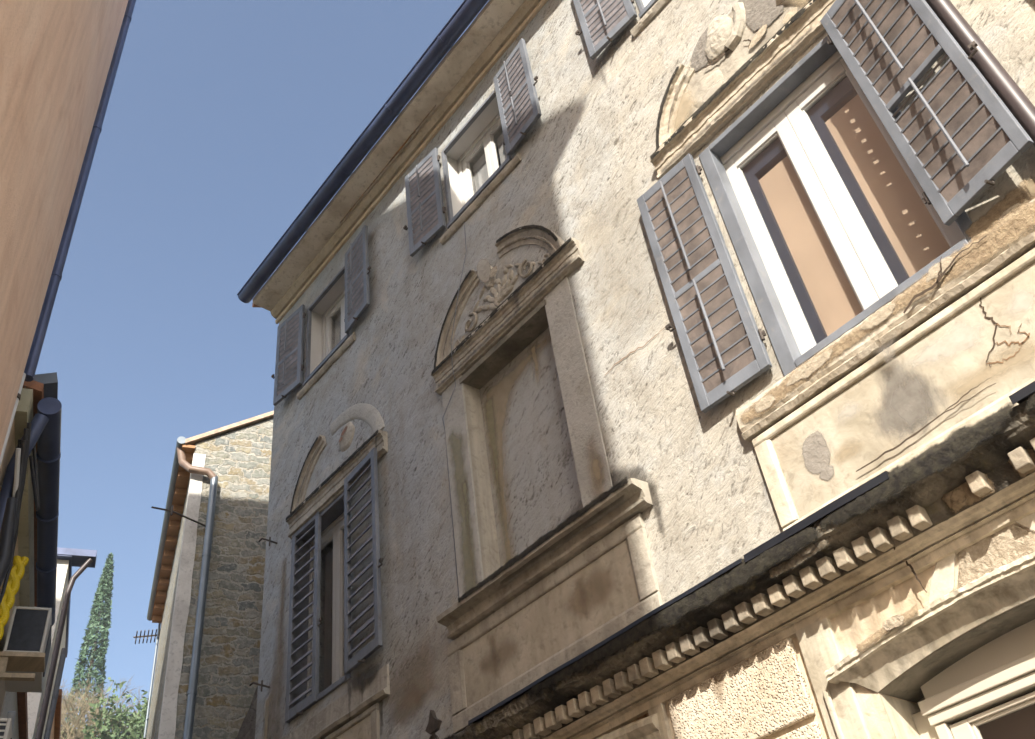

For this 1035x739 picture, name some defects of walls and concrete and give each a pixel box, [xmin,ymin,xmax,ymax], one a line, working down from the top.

water stain [880,345,933,434]
crack [856,298,1030,472]
peeling [820,465,834,480]